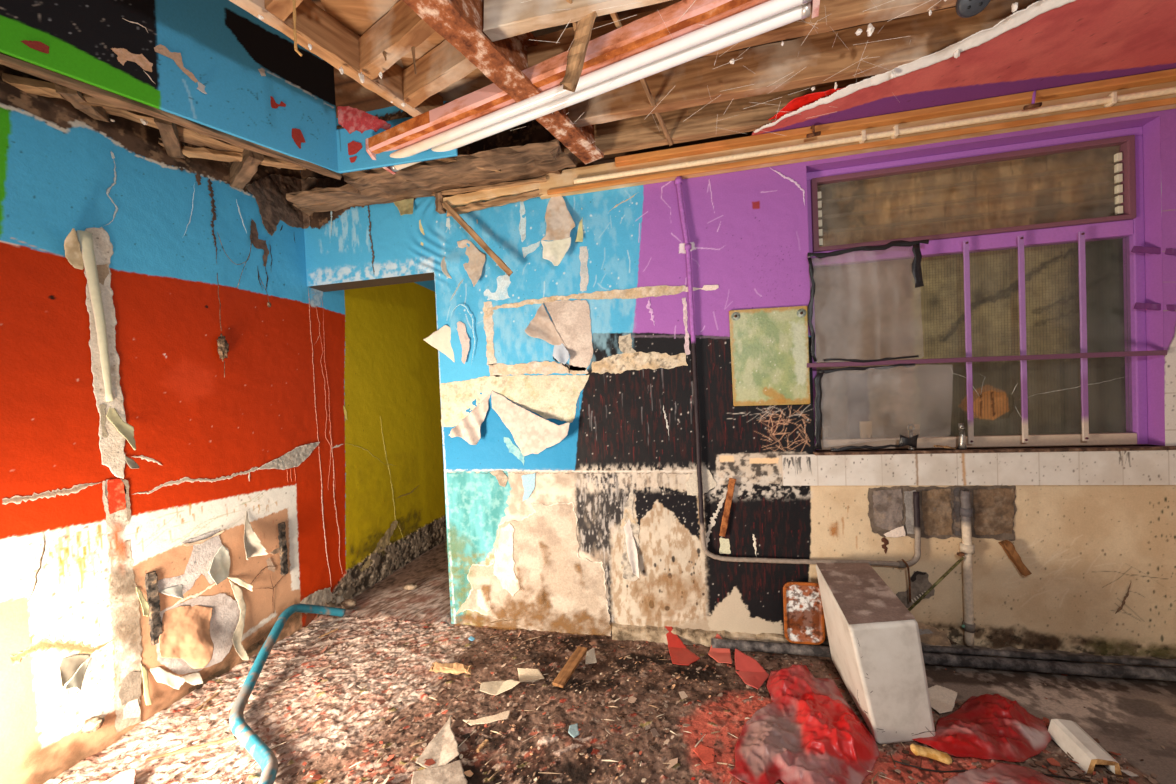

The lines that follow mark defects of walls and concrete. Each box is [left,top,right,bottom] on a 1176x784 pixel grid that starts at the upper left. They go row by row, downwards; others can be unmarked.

peeling [112,44,207,94]
peeling [292,128,306,149]
peeling [337,106,391,163]
spalling [246,174,348,267]
flaking render [457,201,719,377]
crack [2,482,101,505]
peeling [685,469,717,496]
crack [29,534,45,599]
spalling [456,437,611,636]
peeling [620,490,640,581]
flaking render [102,479,143,732]
damp [990,630,1062,648]